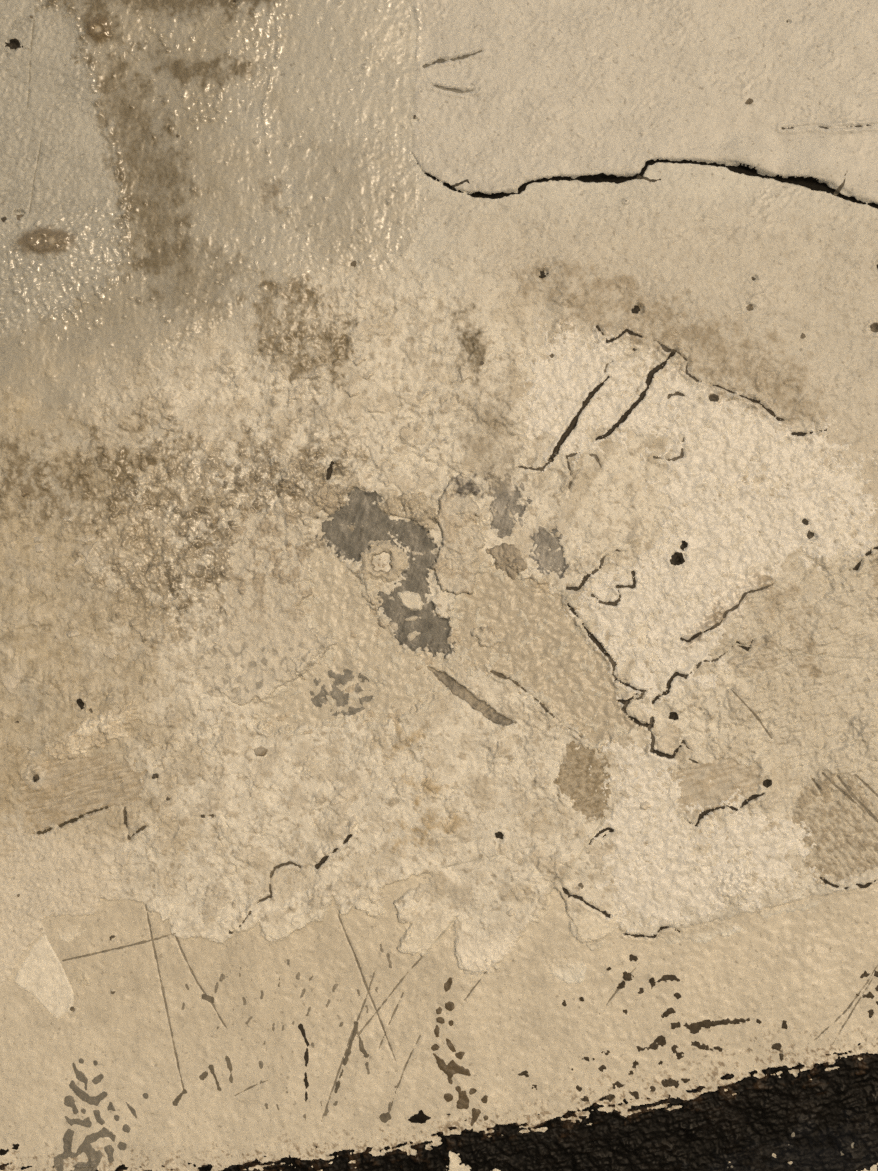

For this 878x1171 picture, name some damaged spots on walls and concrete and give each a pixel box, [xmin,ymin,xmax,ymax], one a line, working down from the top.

crack [417,159,878,209]
water stain [0,0,434,556]
peeling [653,340,697,381]
crack [549,325,827,490]
spalling [185,459,773,821]
crack [566,571,687,759]
crack [680,629,709,642]
crack [490,671,582,738]
crack [689,793,765,827]
crack [820,877,876,890]
peeling [0,769,878,1171]